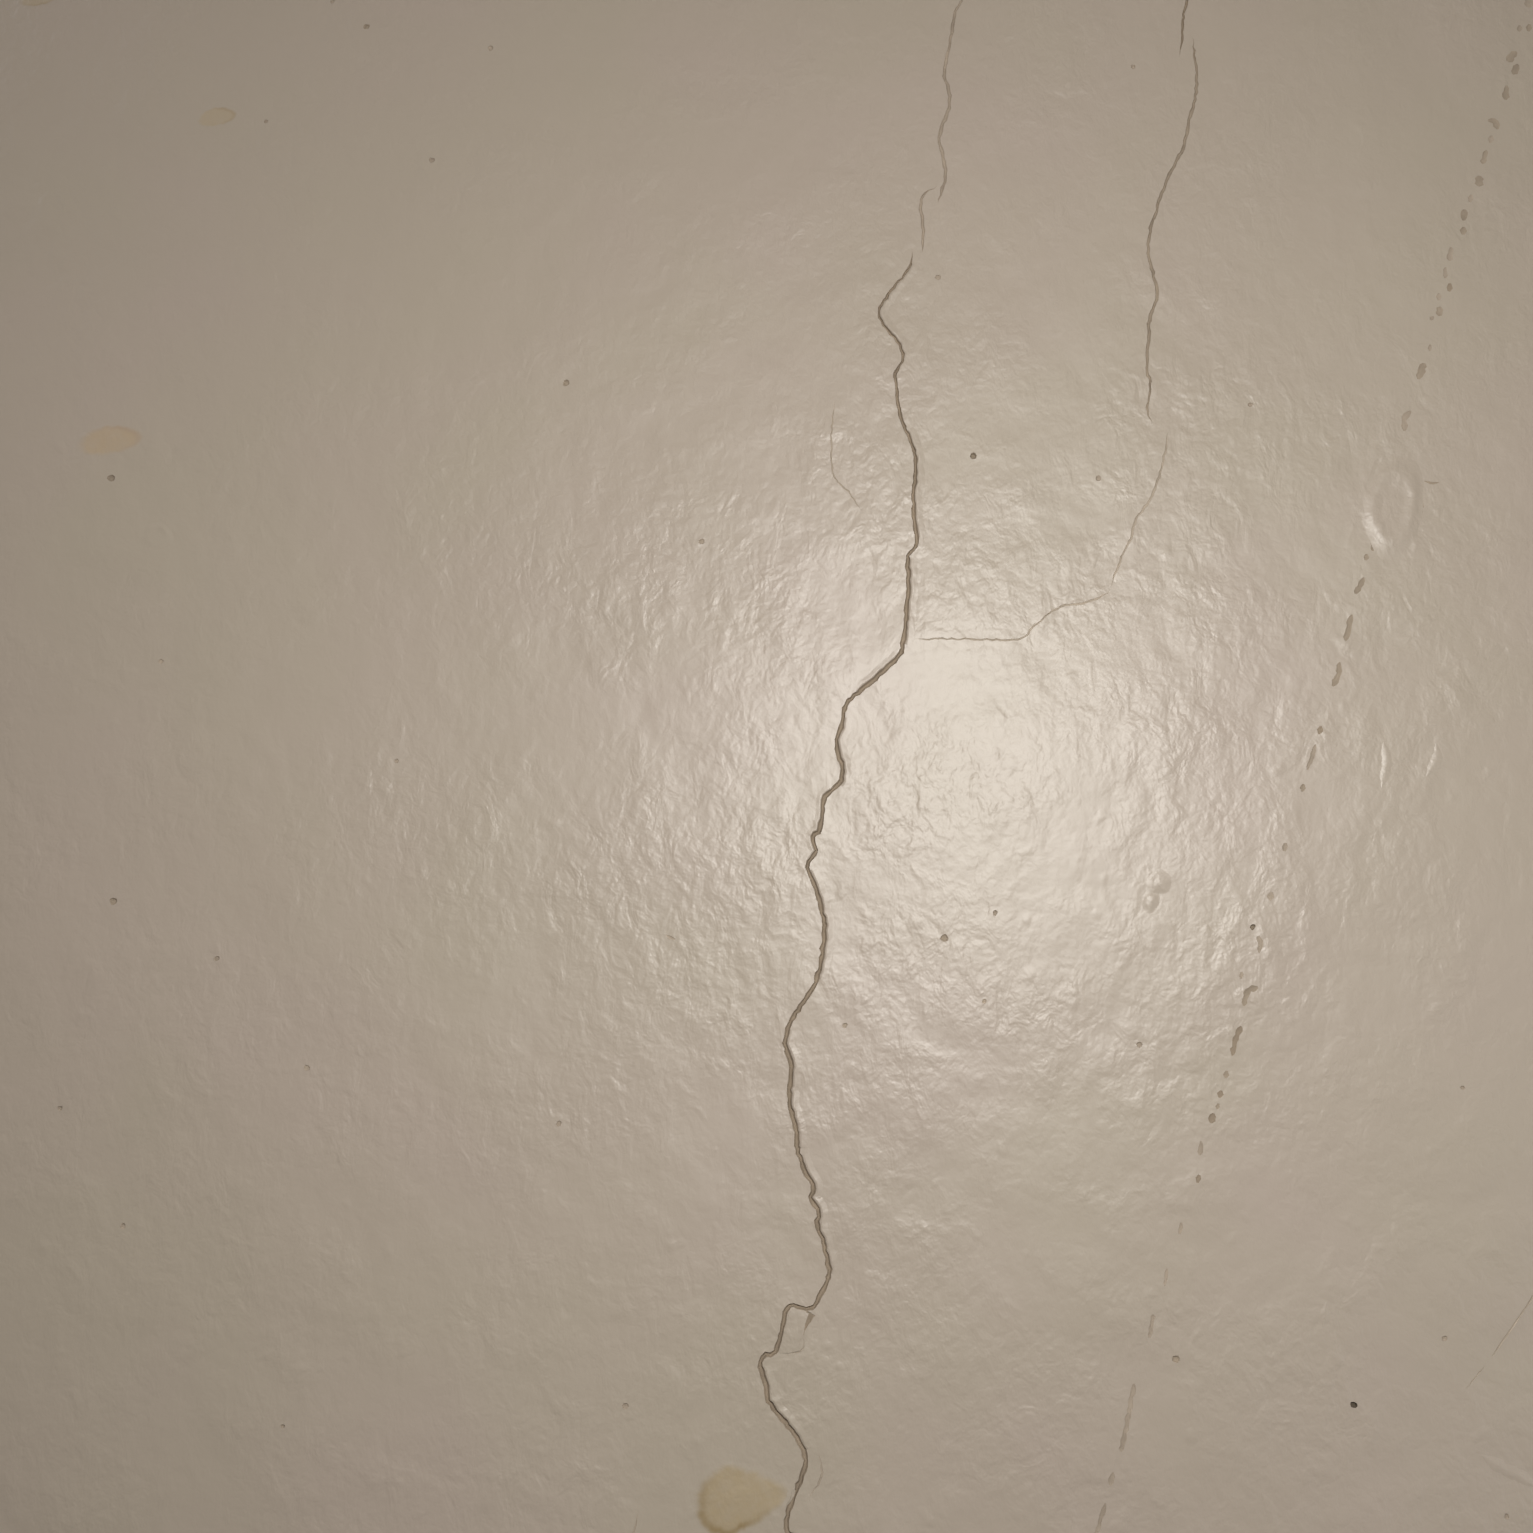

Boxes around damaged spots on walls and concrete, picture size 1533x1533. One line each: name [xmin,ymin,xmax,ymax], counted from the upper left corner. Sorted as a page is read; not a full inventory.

water stain [688,1460,795,1533]
crack [758,0,1199,1533]